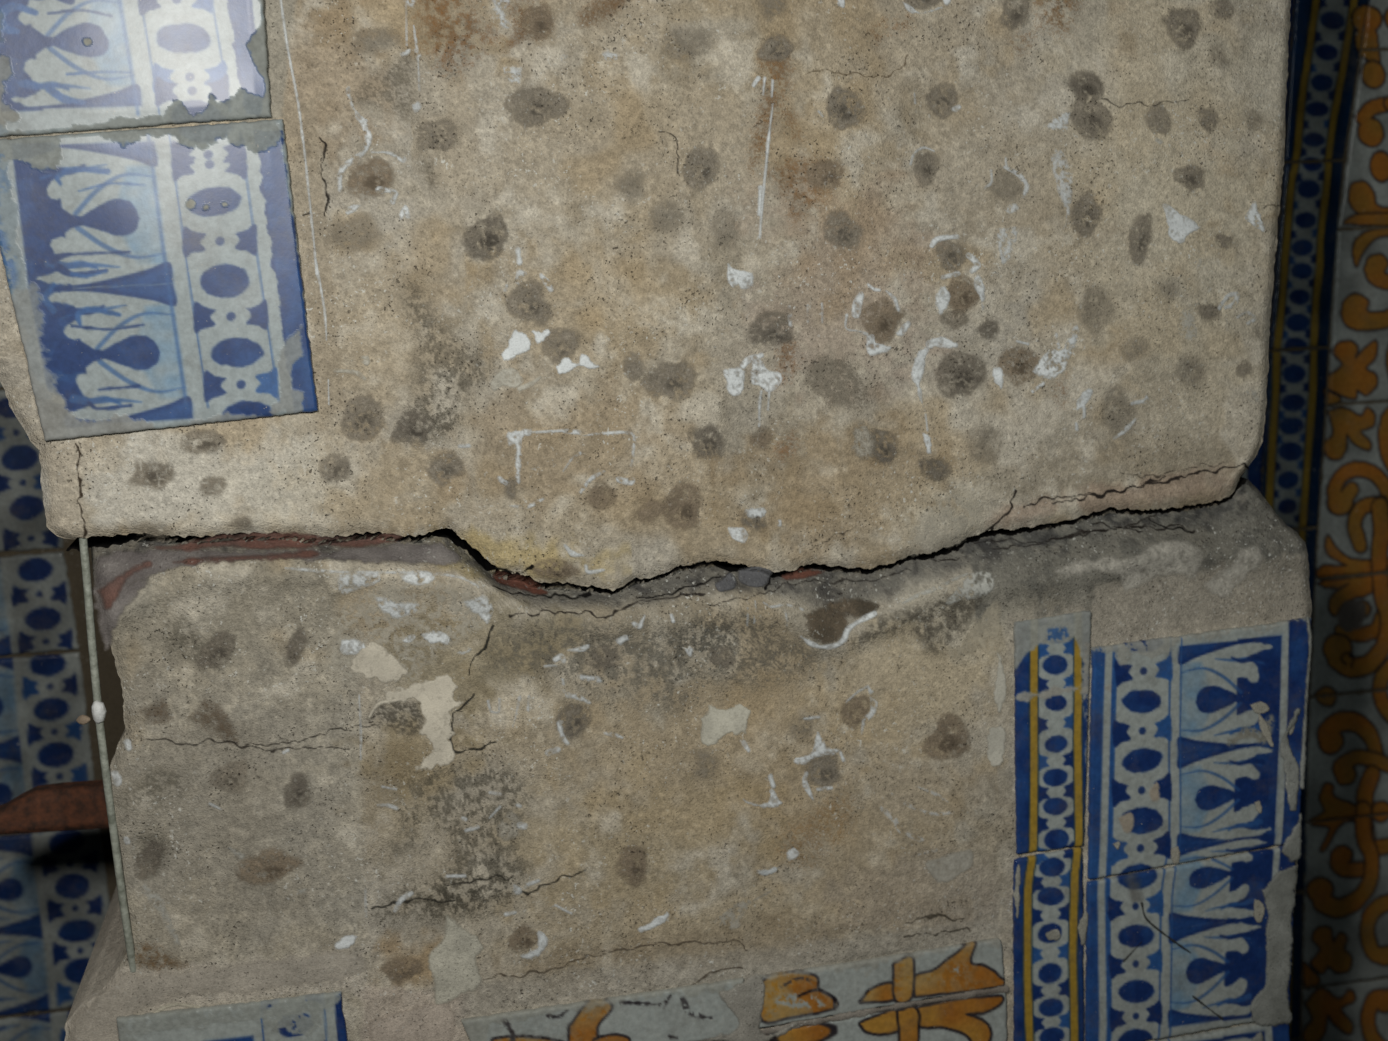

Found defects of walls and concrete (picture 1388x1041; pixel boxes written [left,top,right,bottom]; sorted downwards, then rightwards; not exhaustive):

leakage [403,284,494,435]
spalling [92,518,492,770]
crack [66,443,1249,754]
crack [371,870,585,909]